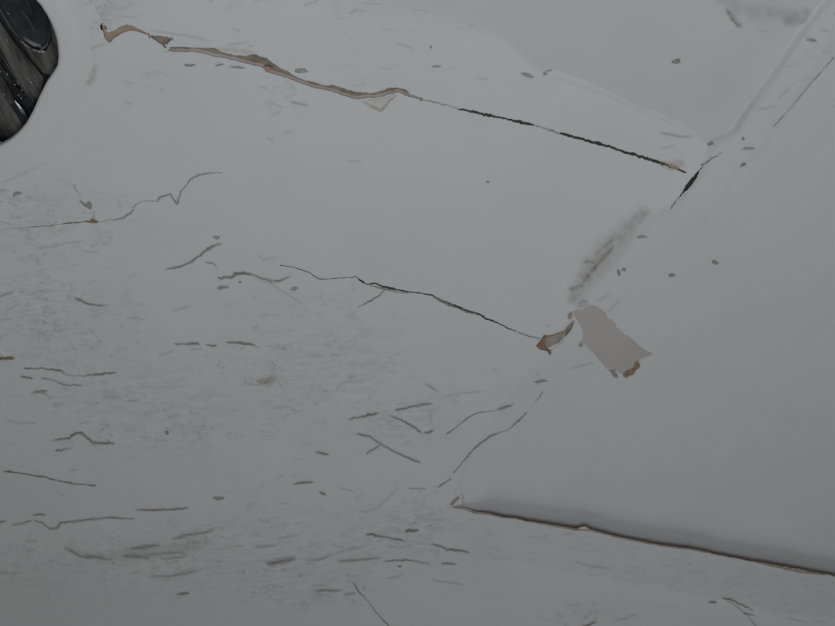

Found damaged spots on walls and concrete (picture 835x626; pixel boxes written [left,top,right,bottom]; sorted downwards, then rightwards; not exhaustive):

crack [101,23,716,209]
crack [14,186,133,229]
crack [167,244,539,339]
crack [177,340,253,348]
peeling [534,300,652,378]